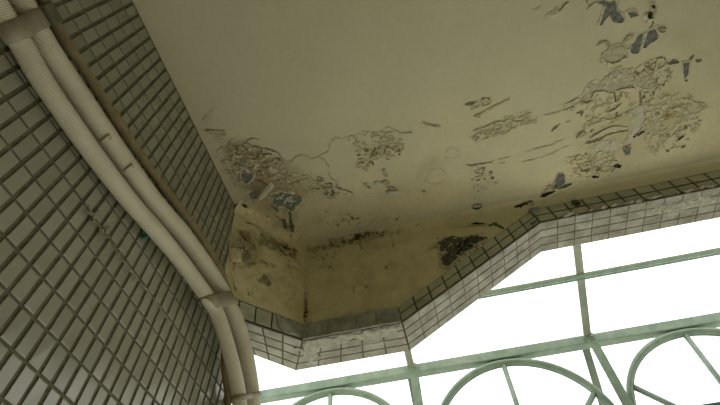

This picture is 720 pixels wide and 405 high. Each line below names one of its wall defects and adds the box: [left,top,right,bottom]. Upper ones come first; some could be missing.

peeling [202,108,354,232]
peeling [348,127,412,172]
peeling [465,97,510,118]
peeling [470,111,538,143]
peeling [514,0,708,215]